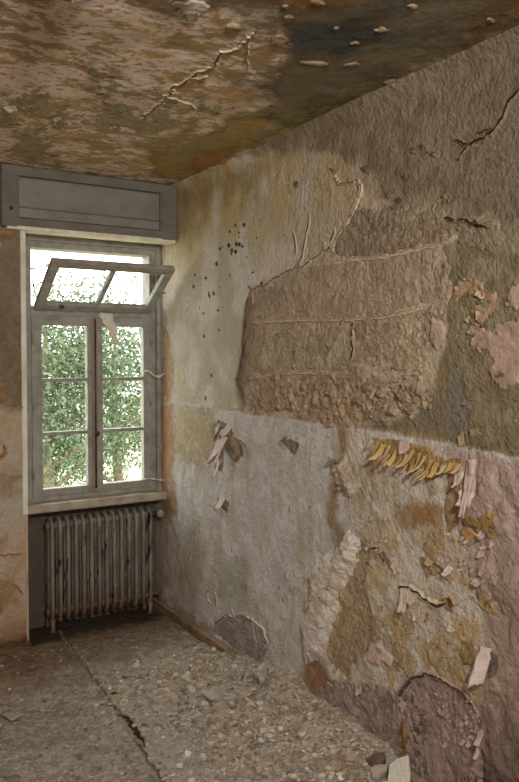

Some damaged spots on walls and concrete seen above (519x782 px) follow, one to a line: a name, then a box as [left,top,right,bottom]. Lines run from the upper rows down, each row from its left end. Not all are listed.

peeling [172,0,211,21]
peeling [0,61,189,158]
crack [139,31,257,122]
leakage [134,0,519,181]
crack [454,87,519,161]
flaking render [173,189,519,478]
peeling [210,496,229,512]
crack [0,552,24,595]
flaking render [213,607,268,661]
flaking render [314,428,499,782]
crack [58,629,164,782]